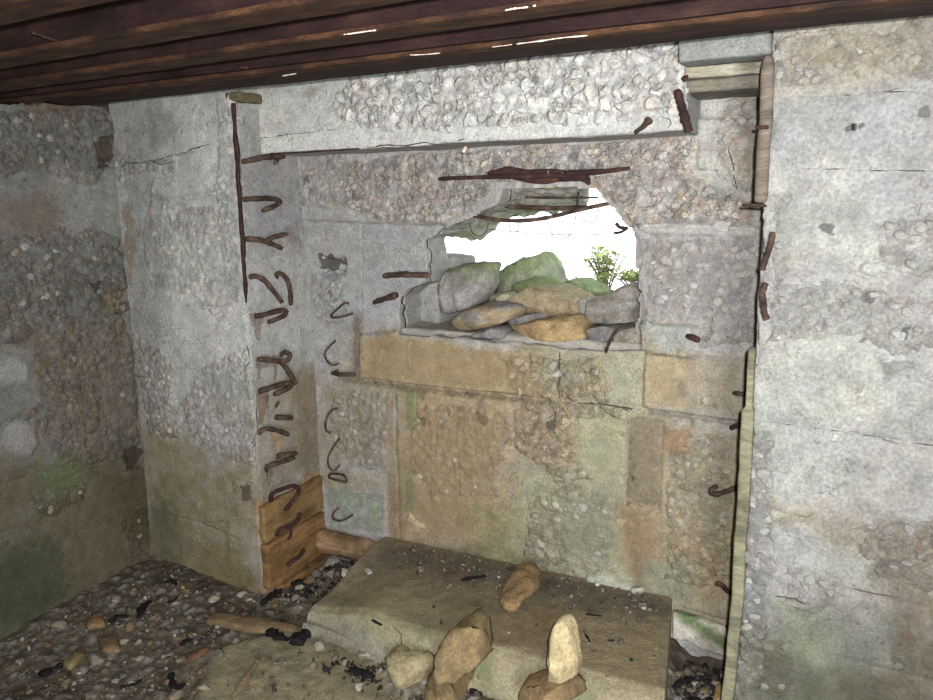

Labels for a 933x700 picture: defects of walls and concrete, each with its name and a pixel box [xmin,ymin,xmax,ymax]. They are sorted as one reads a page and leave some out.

corrosion [674,89,693,133]
corrosion [634,117,653,134]
crack [114,144,210,171]
spalling [300,41,933,356]
corrosion [249,313,263,340]